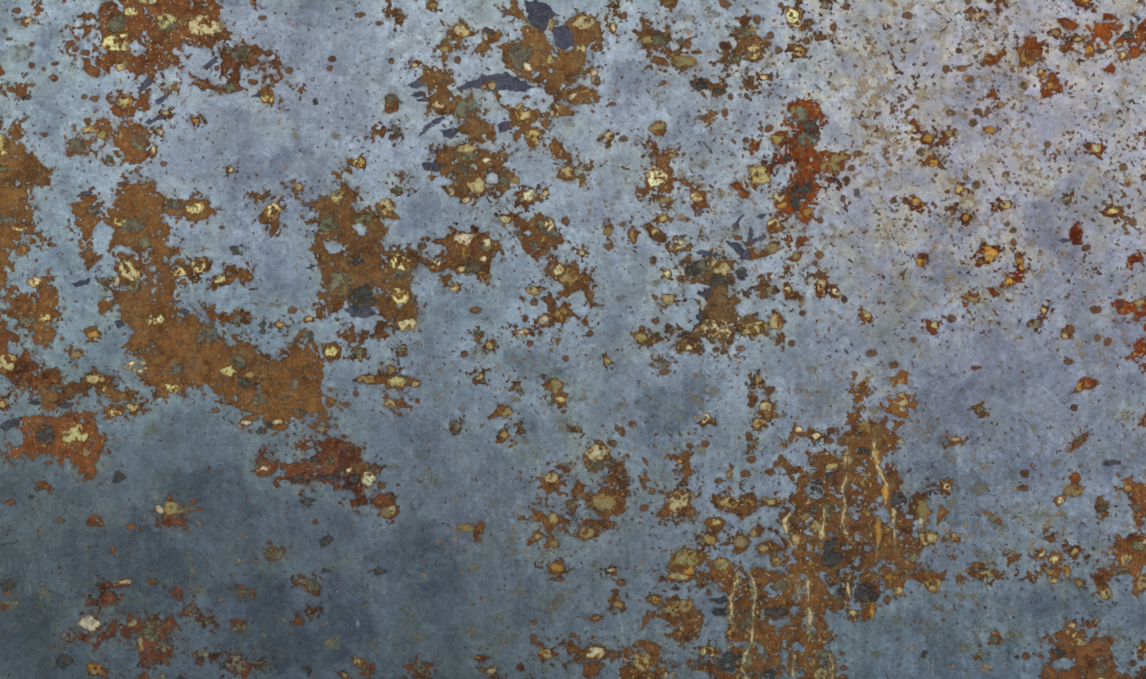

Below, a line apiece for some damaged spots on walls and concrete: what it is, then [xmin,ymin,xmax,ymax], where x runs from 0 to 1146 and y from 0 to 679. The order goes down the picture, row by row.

corrosion [84,515,107,532]
corrosion [126,466,235,544]
corrosion [248,541,339,638]
corrosion [402,652,443,679]